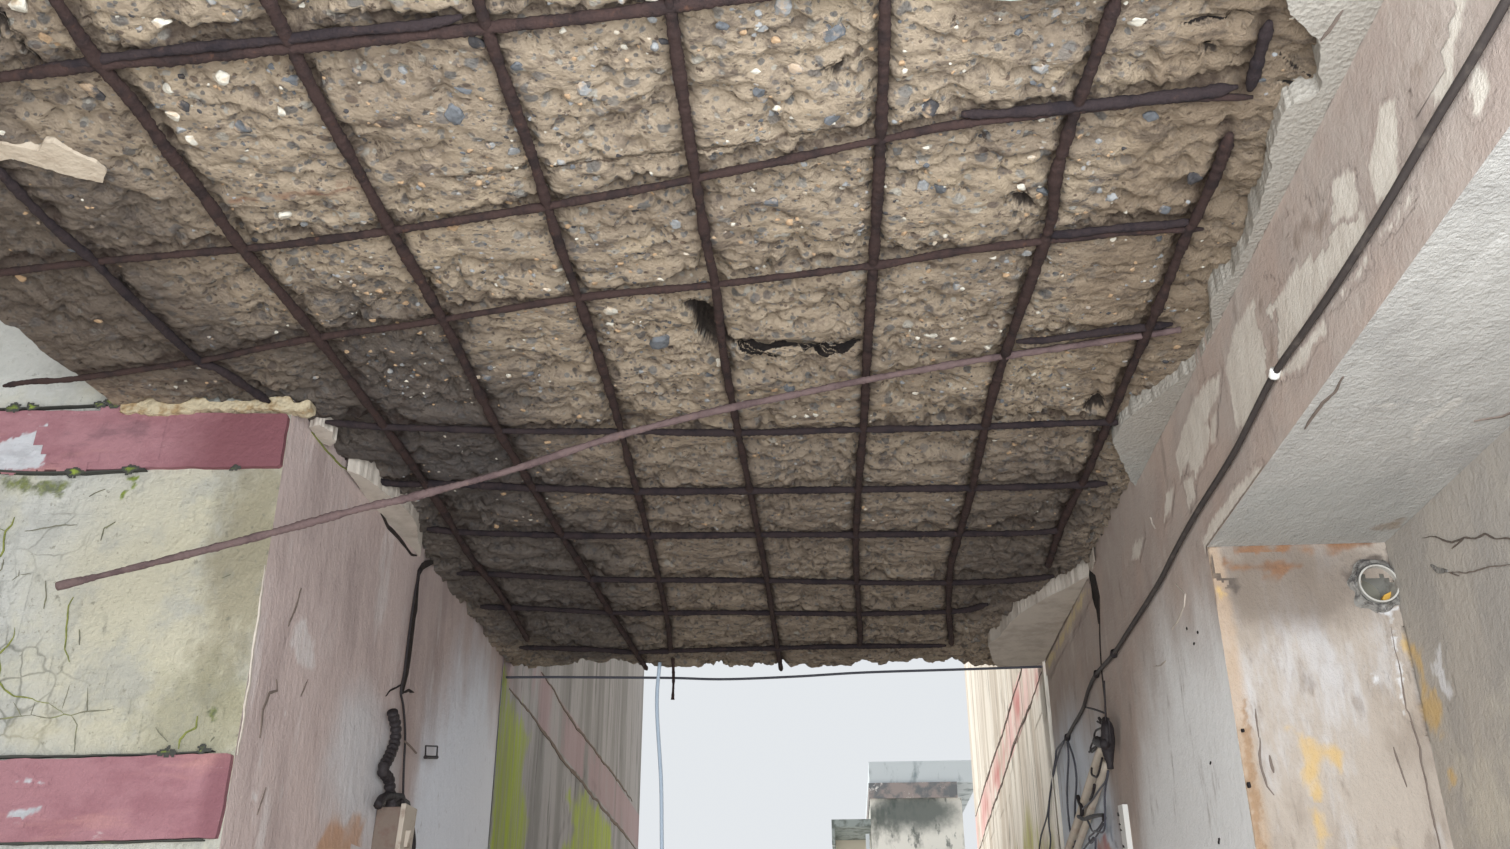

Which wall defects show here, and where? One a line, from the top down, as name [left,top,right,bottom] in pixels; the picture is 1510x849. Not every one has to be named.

rust [210,171,373,208]
peeling [1163,92,1418,526]
spalling [0,0,1317,700]
crack [735,338,863,360]
rust [1207,542,1386,587]
crack [1425,533,1510,576]
crack [0,489,115,752]
spalling [237,565,266,756]
crack [155,716,214,749]